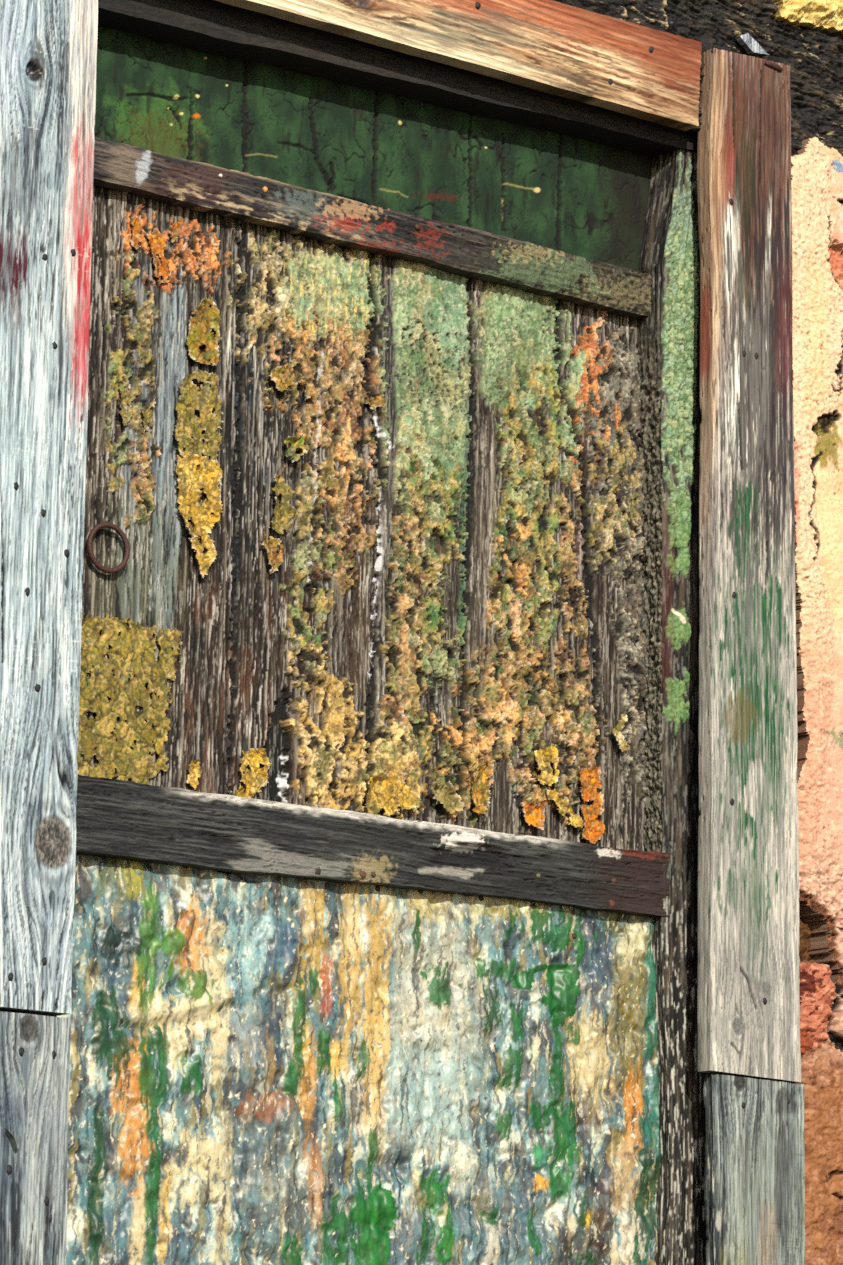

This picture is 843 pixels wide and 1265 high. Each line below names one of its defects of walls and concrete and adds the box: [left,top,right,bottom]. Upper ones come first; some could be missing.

crack [832,345,843,392]
flaking render [799,891,843,1057]